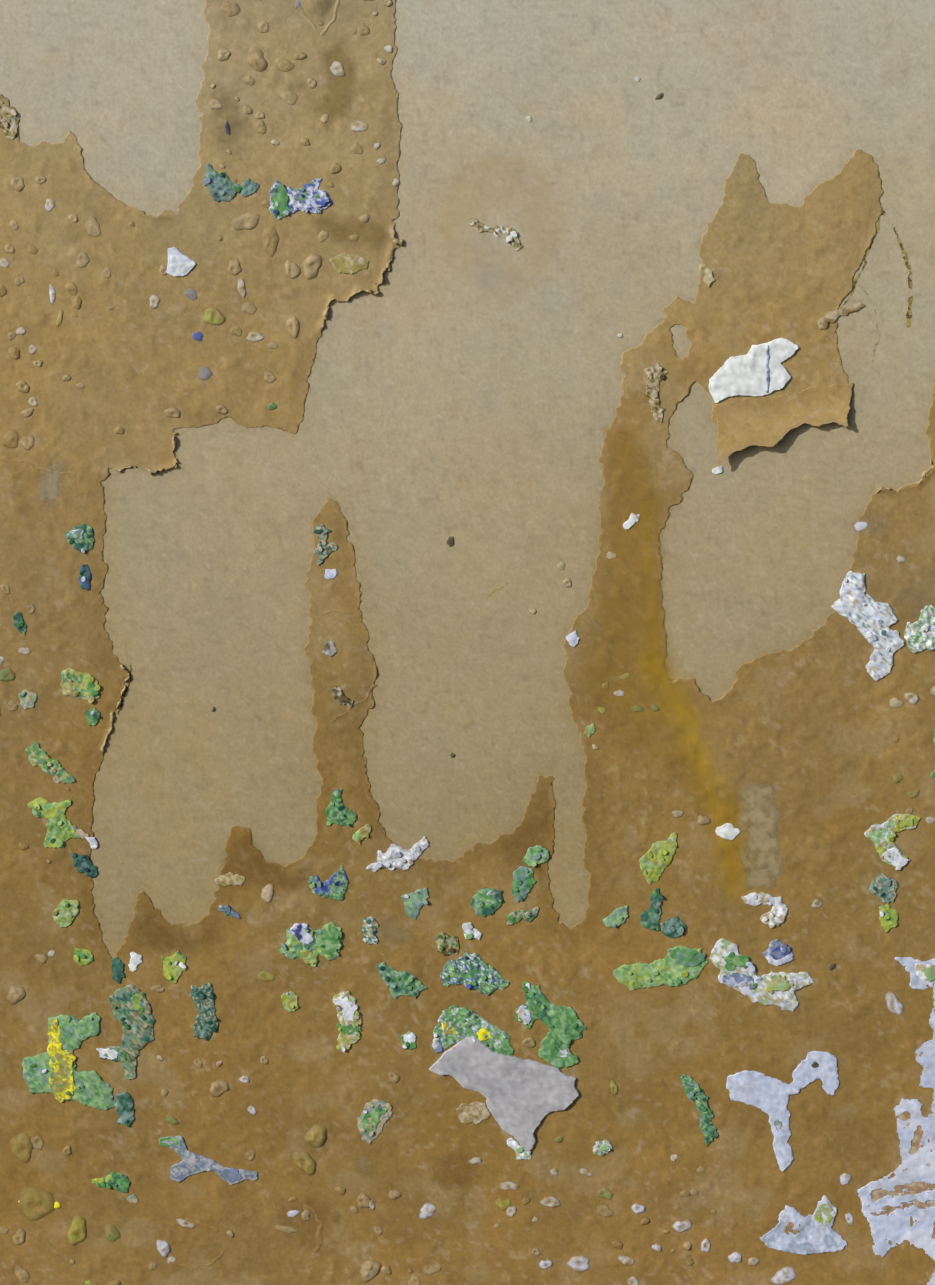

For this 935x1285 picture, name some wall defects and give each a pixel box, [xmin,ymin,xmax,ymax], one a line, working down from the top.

peeling [0,0,935,999]
peeling [603,832,814,1011]
peeling [22,1012,135,1127]
peeling [96,984,155,1080]
peeling [161,950,219,1041]
peeling [159,1135,258,1185]
peeling [332,991,362,1052]
peeling [356,1099,393,1144]
peeling [401,1031,417,1050]
peeling [429,981,587,1160]
peeling [679,1075,718,1146]
peeling [726,1051,840,1172]